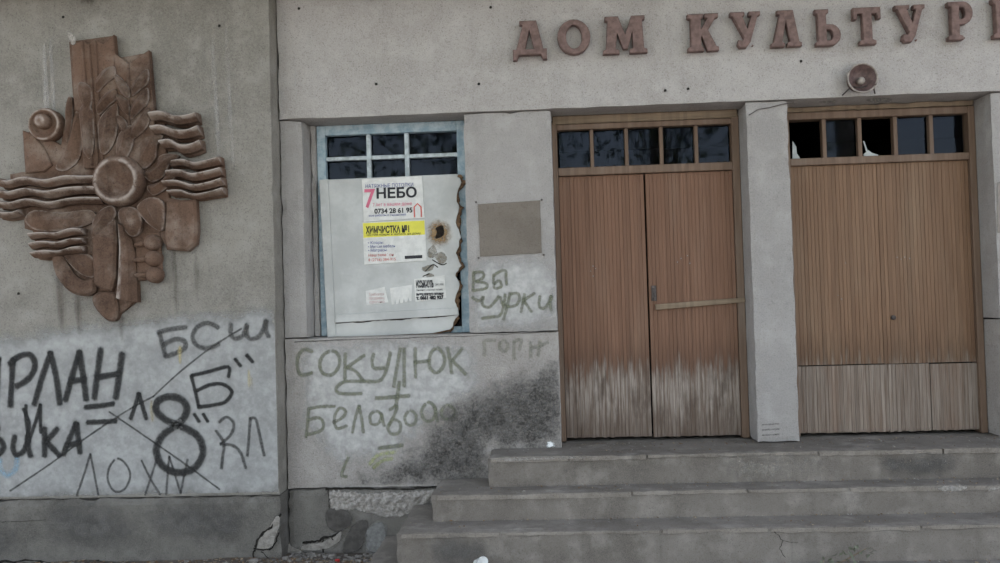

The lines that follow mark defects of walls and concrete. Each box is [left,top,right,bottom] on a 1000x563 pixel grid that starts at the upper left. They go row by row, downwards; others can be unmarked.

spalling [252,513,342,558]